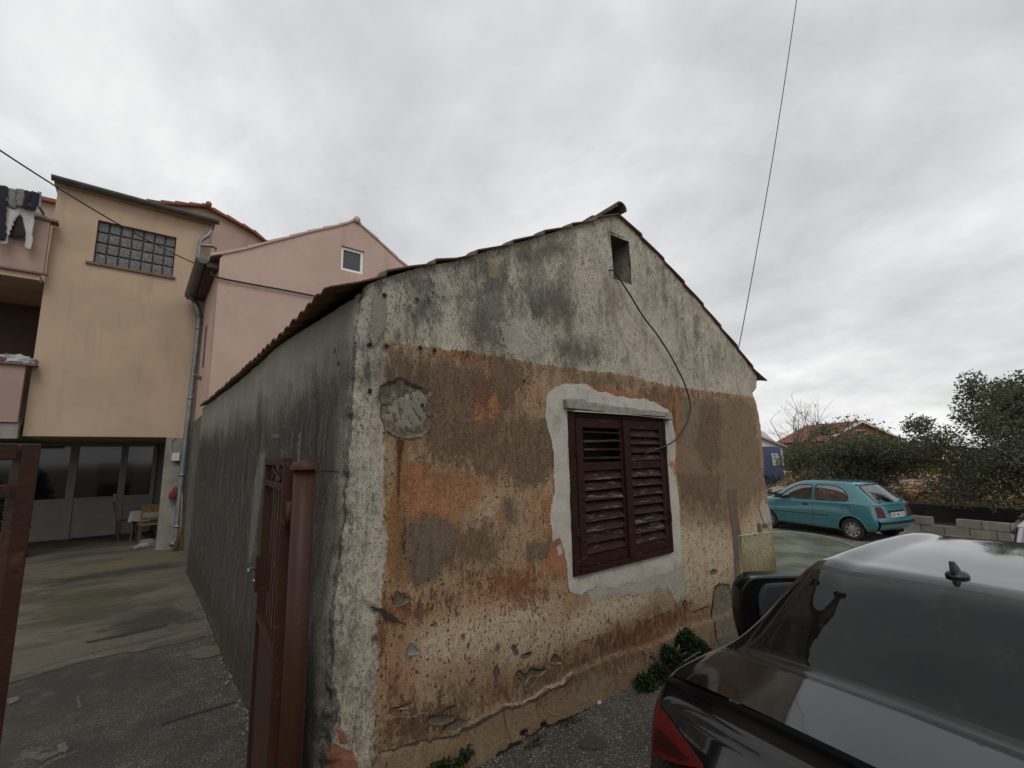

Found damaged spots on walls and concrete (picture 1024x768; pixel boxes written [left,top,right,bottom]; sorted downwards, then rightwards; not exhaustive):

damp [461,231,605,412]
spalling [379,377,432,439]
damp [110,266,440,768]
spalling [362,590,422,658]
spalling [683,569,737,640]
spalling [495,639,568,692]
crack [378,671,590,768]